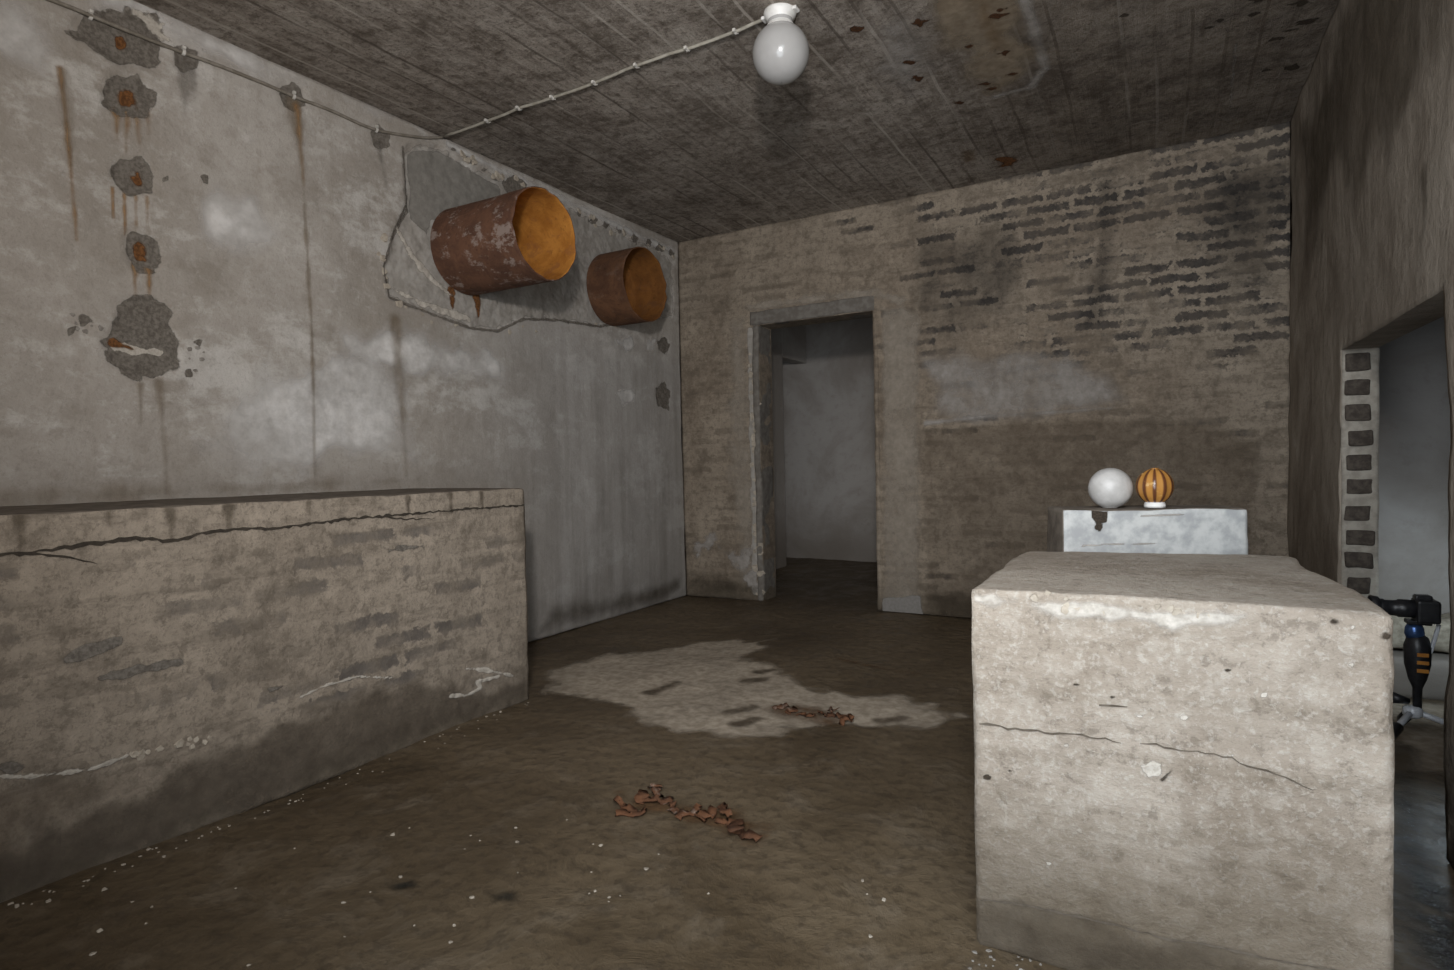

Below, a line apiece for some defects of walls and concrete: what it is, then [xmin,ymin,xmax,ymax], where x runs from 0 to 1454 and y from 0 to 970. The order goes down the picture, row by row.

spalling [65,6,199,127]
corrosion [935,0,1045,97]
spalling [67,156,205,381]
corrosion [447,286,481,317]
crack [0,504,524,564]
crack [980,704,1312,790]